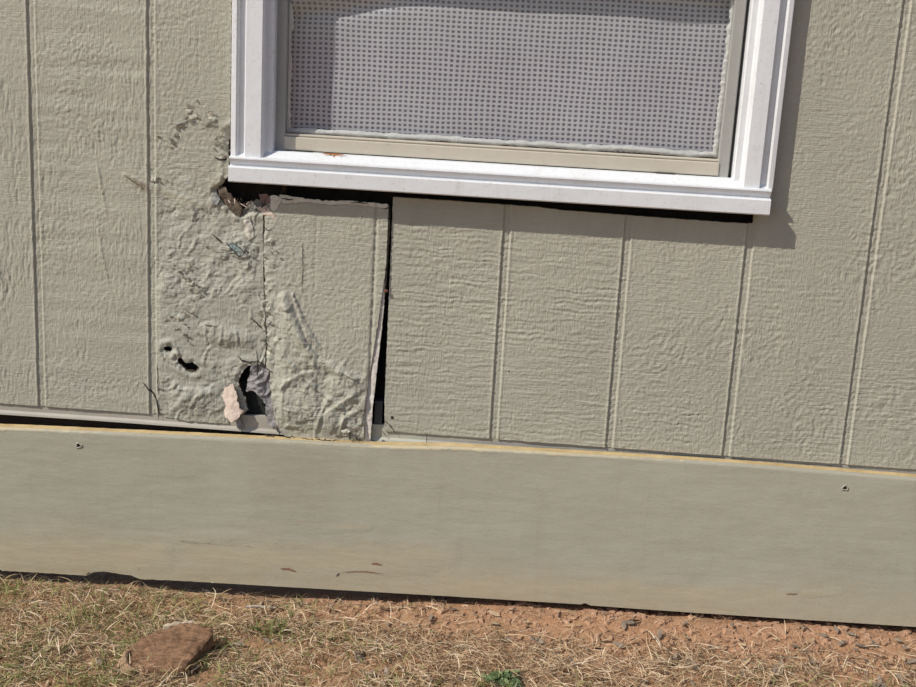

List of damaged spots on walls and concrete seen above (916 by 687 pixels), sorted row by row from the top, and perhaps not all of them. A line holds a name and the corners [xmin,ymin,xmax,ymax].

peeling [158,100,388,240]
crack [263,215,271,297]
peeling [165,263,214,344]
crack [239,317,271,376]
peeling [256,285,280,354]
peeling [221,383,244,422]